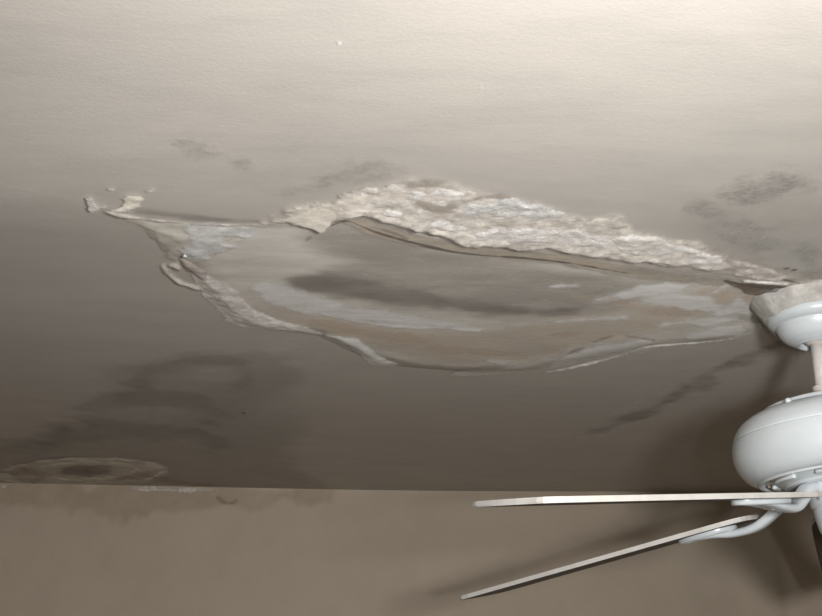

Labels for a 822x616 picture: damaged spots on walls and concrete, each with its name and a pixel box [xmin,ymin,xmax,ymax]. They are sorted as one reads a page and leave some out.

peeling [86,181,810,286]
leakage [161,256,398,367]
leakage [251,273,482,332]
leakage [0,457,165,484]